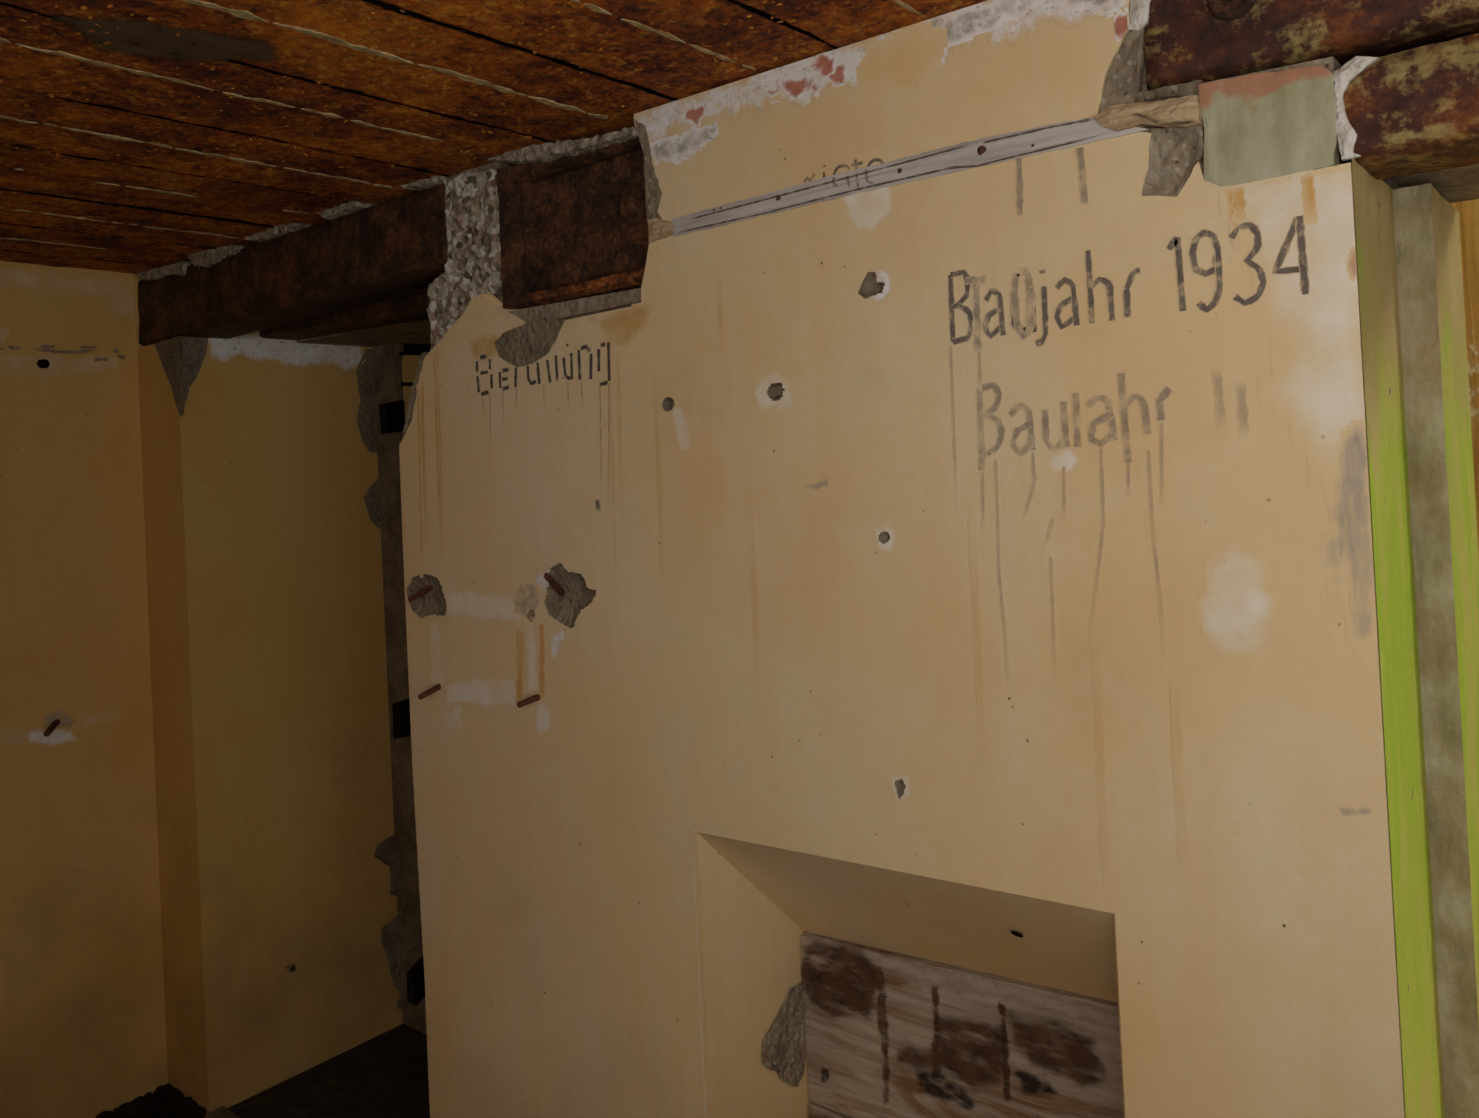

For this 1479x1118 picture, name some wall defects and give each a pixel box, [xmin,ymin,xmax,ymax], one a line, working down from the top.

rust [0,4,156,68]
rust [628,1,857,77]
rust [0,60,359,206]
rust [377,3,685,182]
peeling [634,0,1204,244]
spalling [401,168,502,442]
spalling [363,476,381,529]
spalling [406,574,446,618]
spalling [544,563,597,628]
spalling [375,835,398,896]